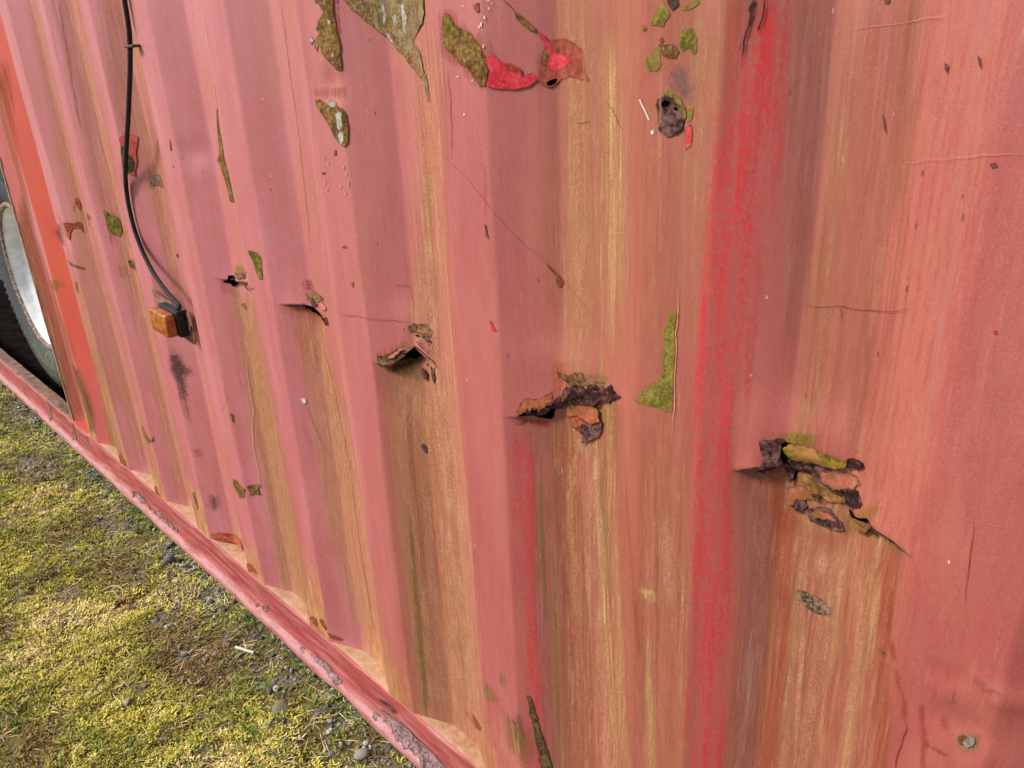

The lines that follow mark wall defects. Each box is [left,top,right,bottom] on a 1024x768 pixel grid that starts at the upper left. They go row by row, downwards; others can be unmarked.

peeling [309,0,434,131]
peeling [442,0,492,87]
peeling [642,0,699,72]
peeling [315,90,349,196]
rust [55,0,198,511]
rust [388,35,487,768]
peeling [635,294,679,429]
rust [538,402,645,768]
rust [796,589,830,616]